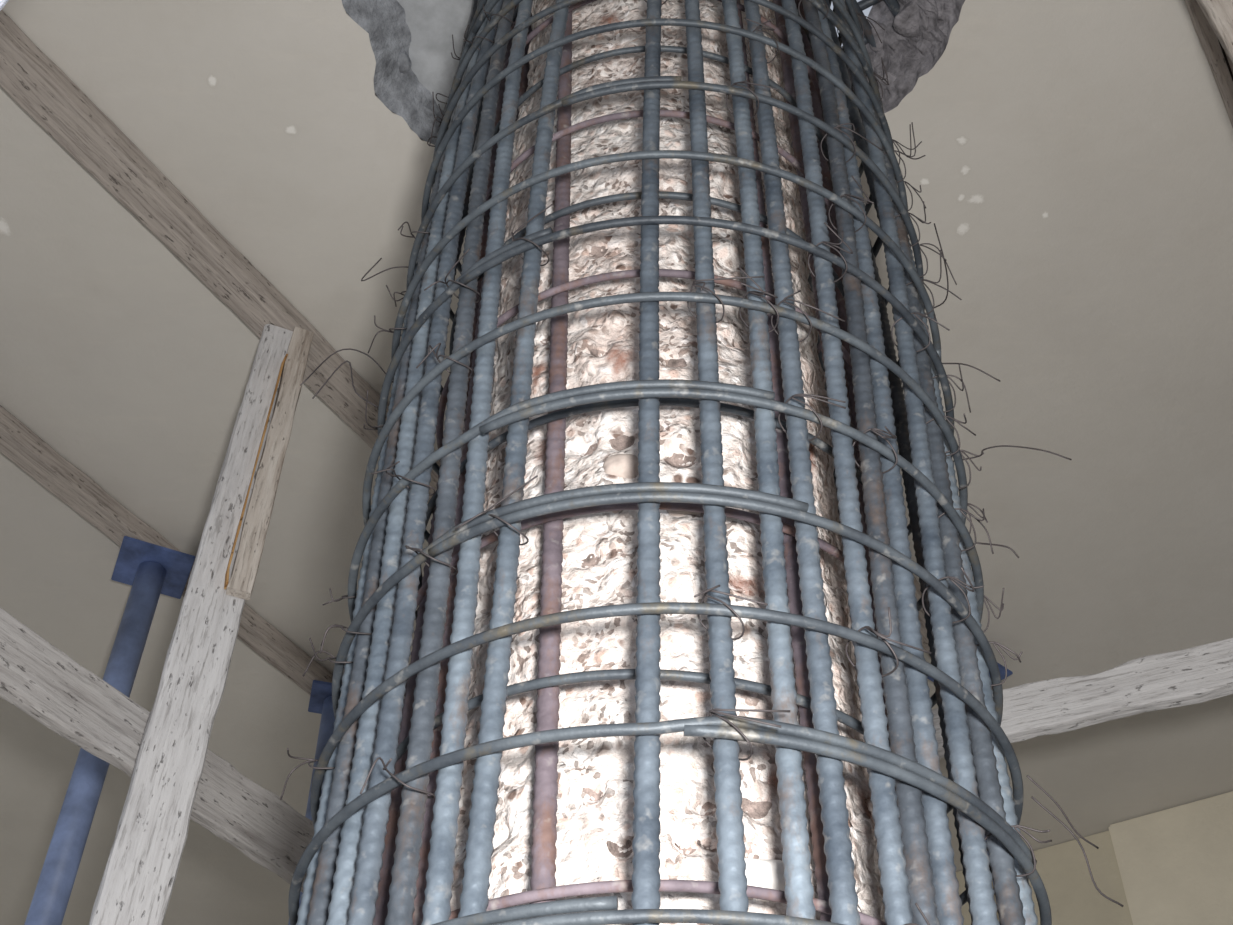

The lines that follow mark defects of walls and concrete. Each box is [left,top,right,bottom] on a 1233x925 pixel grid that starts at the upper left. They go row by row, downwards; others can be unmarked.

spalling [589,246,608,258]
spalling [296,0,572,925]
spalling [580,398,724,486]
spalling [639,0,1021,836]
spalling [581,553,601,569]
spalling [606,502,861,925]
spalling [583,788,603,802]
spalling [867,768,1038,925]